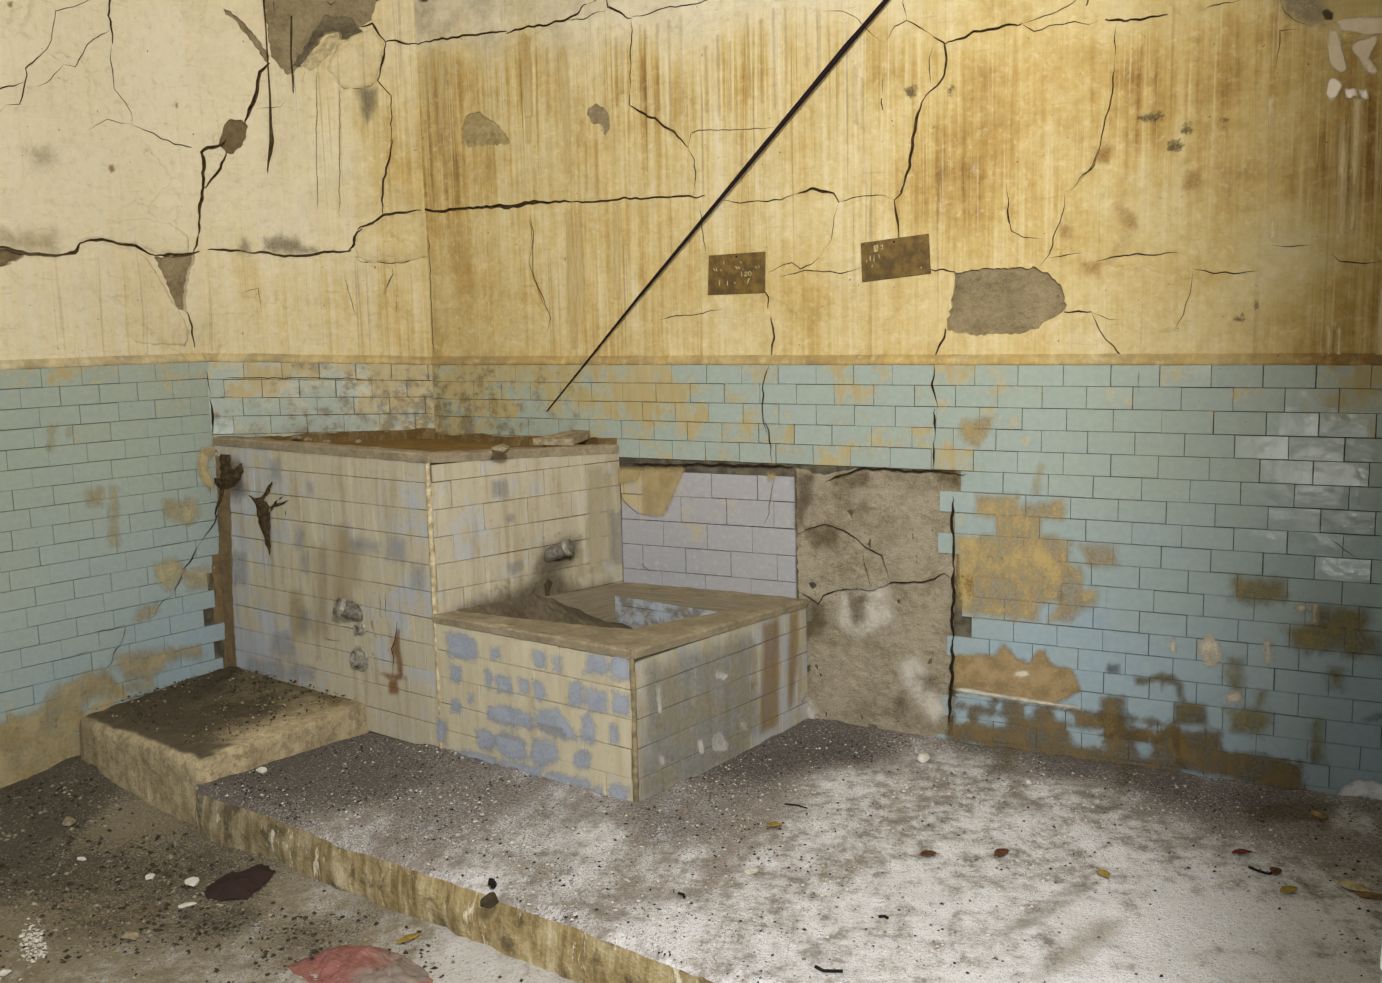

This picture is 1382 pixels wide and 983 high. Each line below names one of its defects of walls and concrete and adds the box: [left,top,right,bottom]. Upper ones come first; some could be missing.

spalling [224,0,380,75]
spalling [462,112,510,148]
water stain [1339,98,1362,233]
crack [0,0,1374,520]
spalling [948,267,1067,336]
crack [77,514,218,674]
rust [386,632,402,693]
peeling [448,633,629,801]
flaking render [796,468,962,736]
crack [798,329,966,725]